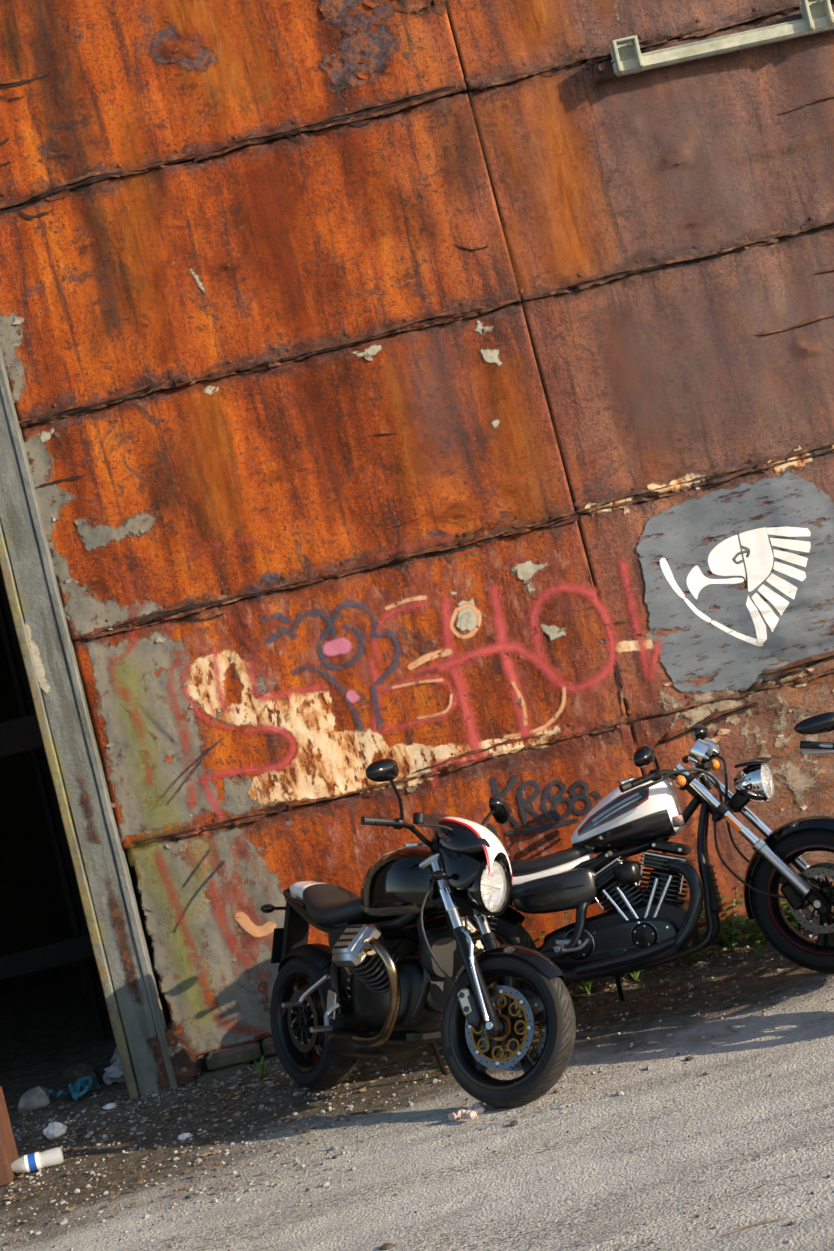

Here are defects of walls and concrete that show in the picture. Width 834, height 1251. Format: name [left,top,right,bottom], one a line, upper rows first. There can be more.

rust [319,0,444,94]
crack [775,95,834,116]
crack [754,314,834,336]
peeling [24,429,826,1090]